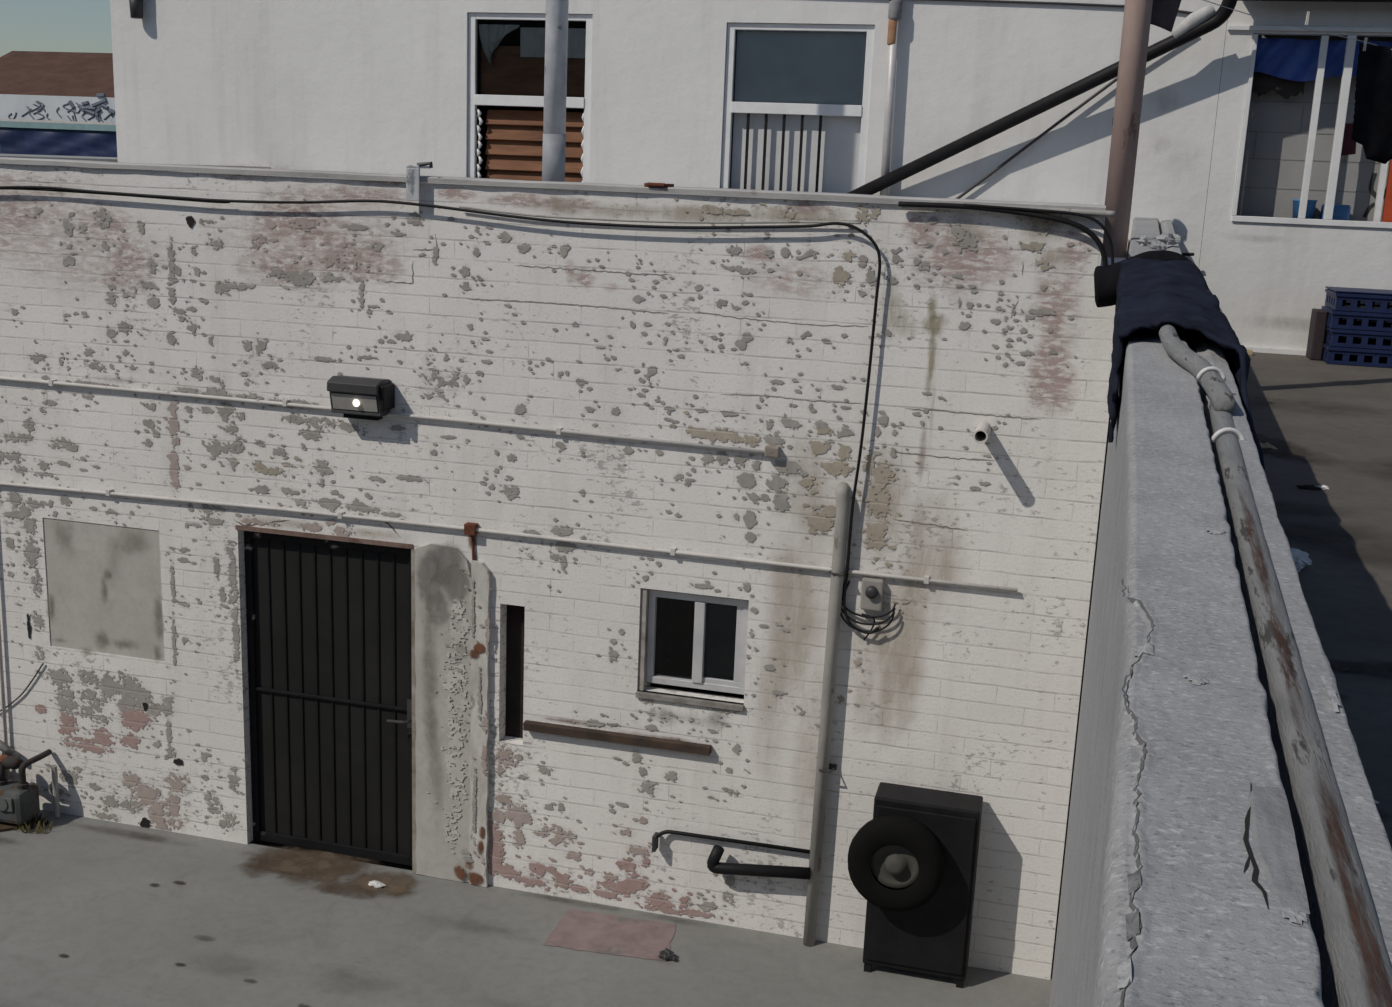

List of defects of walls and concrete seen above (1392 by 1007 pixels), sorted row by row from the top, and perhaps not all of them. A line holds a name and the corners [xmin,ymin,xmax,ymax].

peeling [523,197,1090,567]
damp [926,301,941,379]
peeling [0,198,570,834]
damp [418,545,468,620]
peeling [518,489,600,592]
rust [1246,508,1268,592]
rust [1274,618,1298,691]
rust [454,827,484,885]
peeling [426,567,750,921]
crack [1119,578,1155,1007]
crack [1243,782,1269,909]
rust [1322,790,1392,1007]